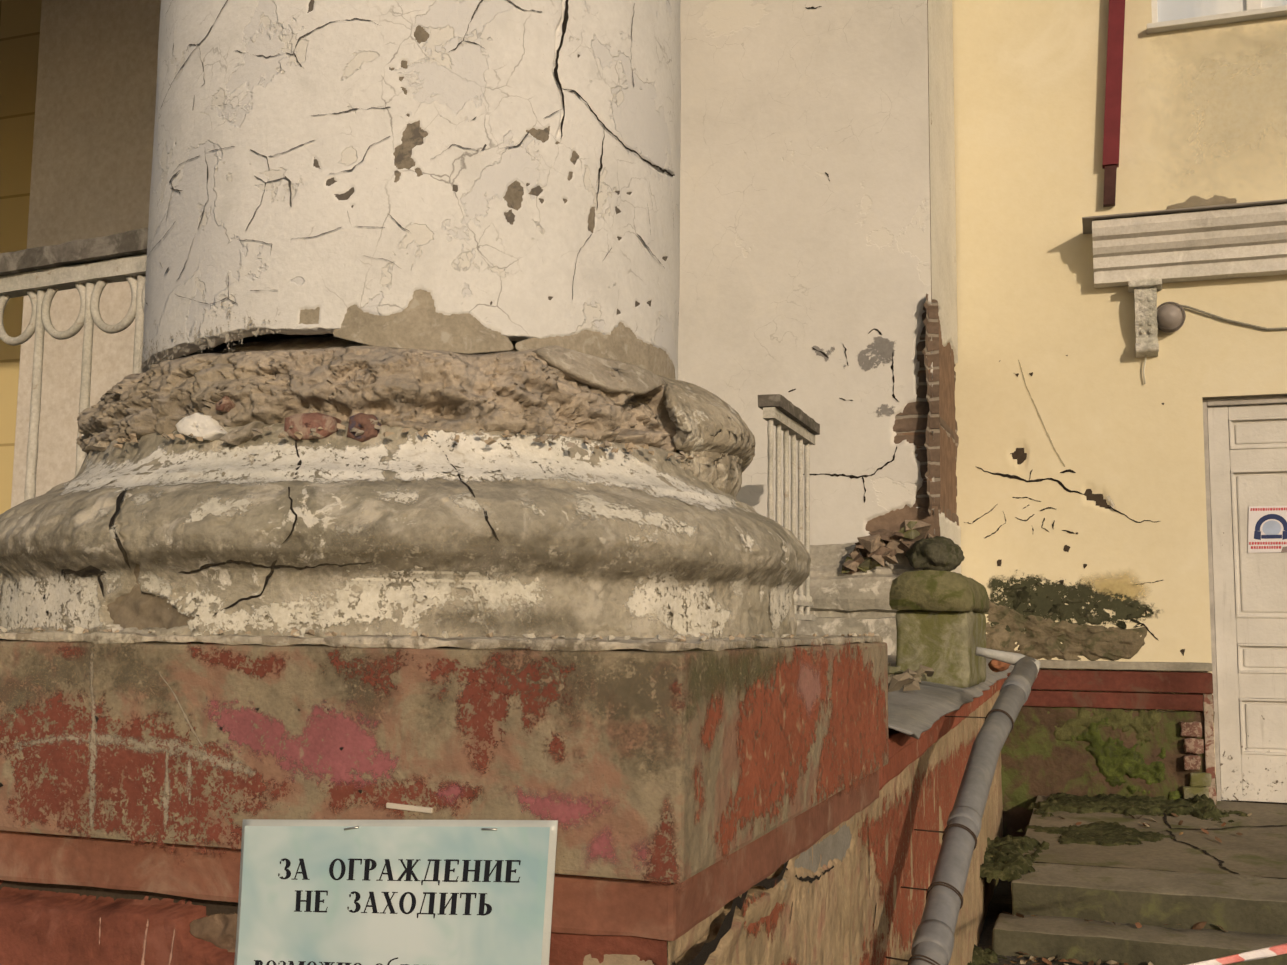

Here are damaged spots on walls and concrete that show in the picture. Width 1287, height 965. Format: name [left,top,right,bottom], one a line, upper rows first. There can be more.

crack [145,107,409,305]
crack [431,0,675,300]
crack [179,441,372,616]
spalling [60,289,741,547]
crack [803,447,897,503]
peeling [844,336,895,371]
spalling [865,294,959,540]
crack [964,360,1159,538]
peeling [0,564,553,679]
peeling [0,645,581,855]
spalling [583,951,676,965]
crack [688,860,834,965]